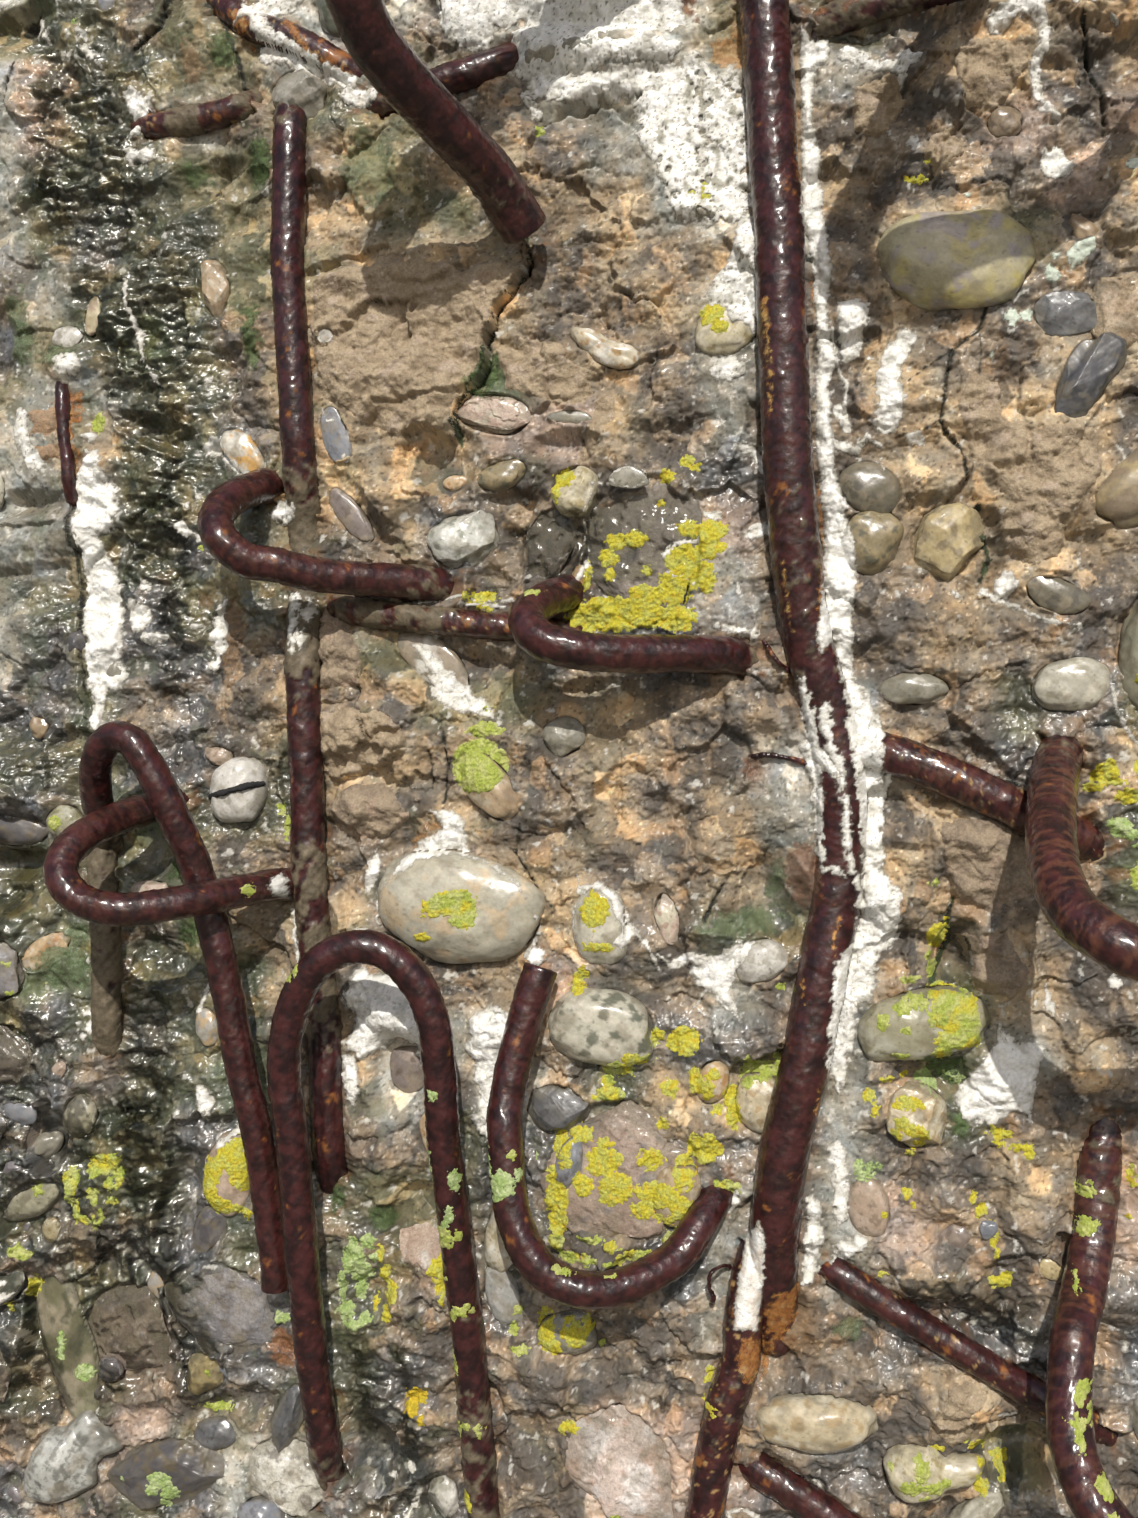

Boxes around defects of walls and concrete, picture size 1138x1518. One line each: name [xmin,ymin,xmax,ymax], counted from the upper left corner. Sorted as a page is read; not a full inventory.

damp [233,0,378,108]
rust [681,0,699,24]
damp [436,0,758,382]
damp [51,351,81,377]
crack [447,238,533,447]
rust [761,297,774,411]
damp [70,432,229,731]
rust [200,596,247,668]
damp [796,26,925,1095]
rust [783,843,821,908]
damp [800,1140,868,1286]
rust [735,1283,799,1383]